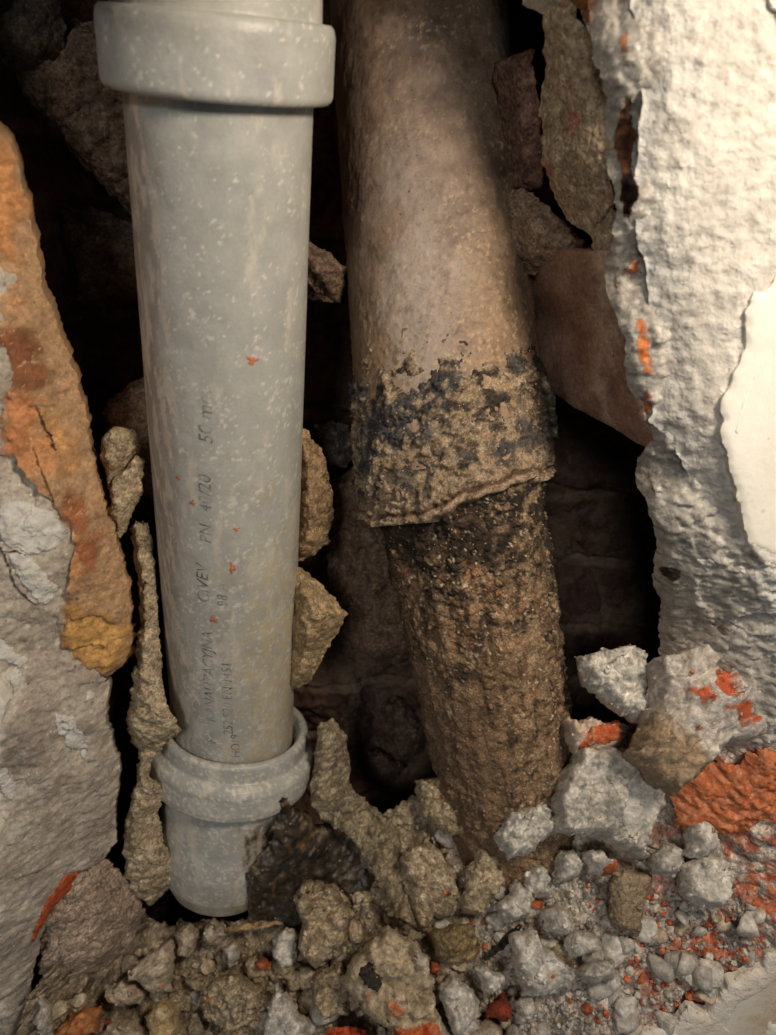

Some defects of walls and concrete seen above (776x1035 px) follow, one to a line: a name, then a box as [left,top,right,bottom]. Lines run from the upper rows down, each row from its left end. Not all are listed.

spalling [60,0,108,32]
spalling [322,0,331,26]
spalling [509,0,547,102]
spalling [303,87,354,482]
spalling [531,0,776,764]
spalling [0,55,170,1035]
spalling [298,546,330,594]
spalling [293,634,436,824]
spalling [141,889,249,926]
peeling [639,951,776,1035]